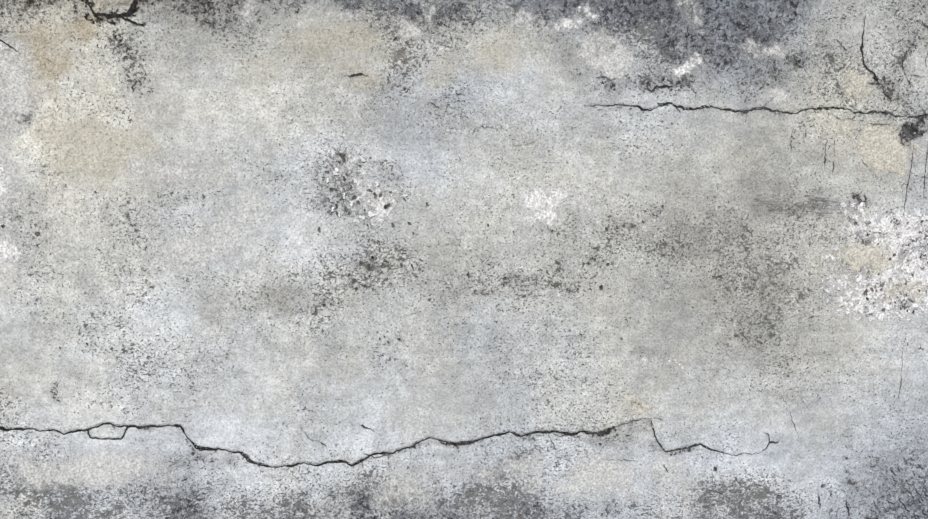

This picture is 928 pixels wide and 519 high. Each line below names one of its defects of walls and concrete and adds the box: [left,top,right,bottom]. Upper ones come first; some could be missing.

leakage [97,1,154,98]
leakage [158,0,312,51]
leakage [327,0,824,105]
crack [584,15,928,169]
crack [904,149,928,211]
peeling [818,198,928,334]
crack [0,397,808,472]